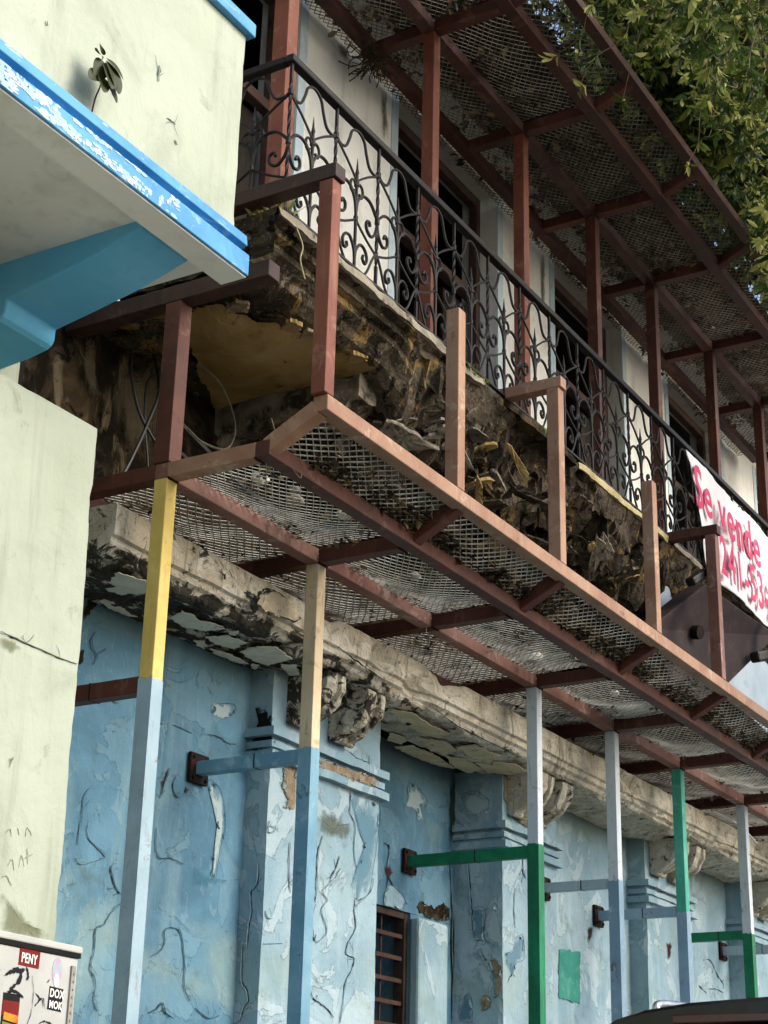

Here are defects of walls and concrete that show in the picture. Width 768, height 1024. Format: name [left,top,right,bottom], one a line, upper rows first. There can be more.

peeling [0,59,180,219]
spalling [364,399,446,451]
spalling [465,415,549,553]
flaking render [99,572,147,617]
spalling [565,494,645,602]
crack [0,631,106,665]
flaking render [170,610,300,676]
crack [173,724,239,750]
flaking render [387,709,527,804]
crack [75,788,120,1016]
crack [150,752,408,1023]
spalling [383,885,450,921]